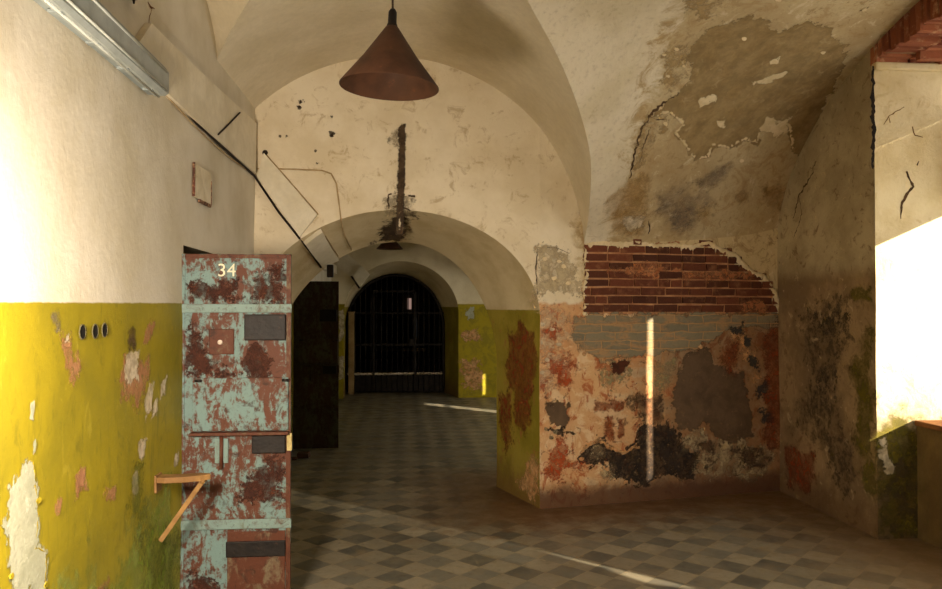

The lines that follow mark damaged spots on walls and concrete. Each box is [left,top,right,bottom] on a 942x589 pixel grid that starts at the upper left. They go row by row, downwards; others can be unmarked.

flaking render [654,0,850,160]
crack [900,161,919,219]
leakage [369,212,419,246]
peeling [52,314,81,386]
peeling [119,318,167,422]
peeling [457,357,484,392]
flaking render [498,239,779,454]
leakage [795,293,855,500]
peeling [1,439,49,589]
peeling [132,438,146,495]
peeling [515,455,539,502]
peeling [577,419,778,488]